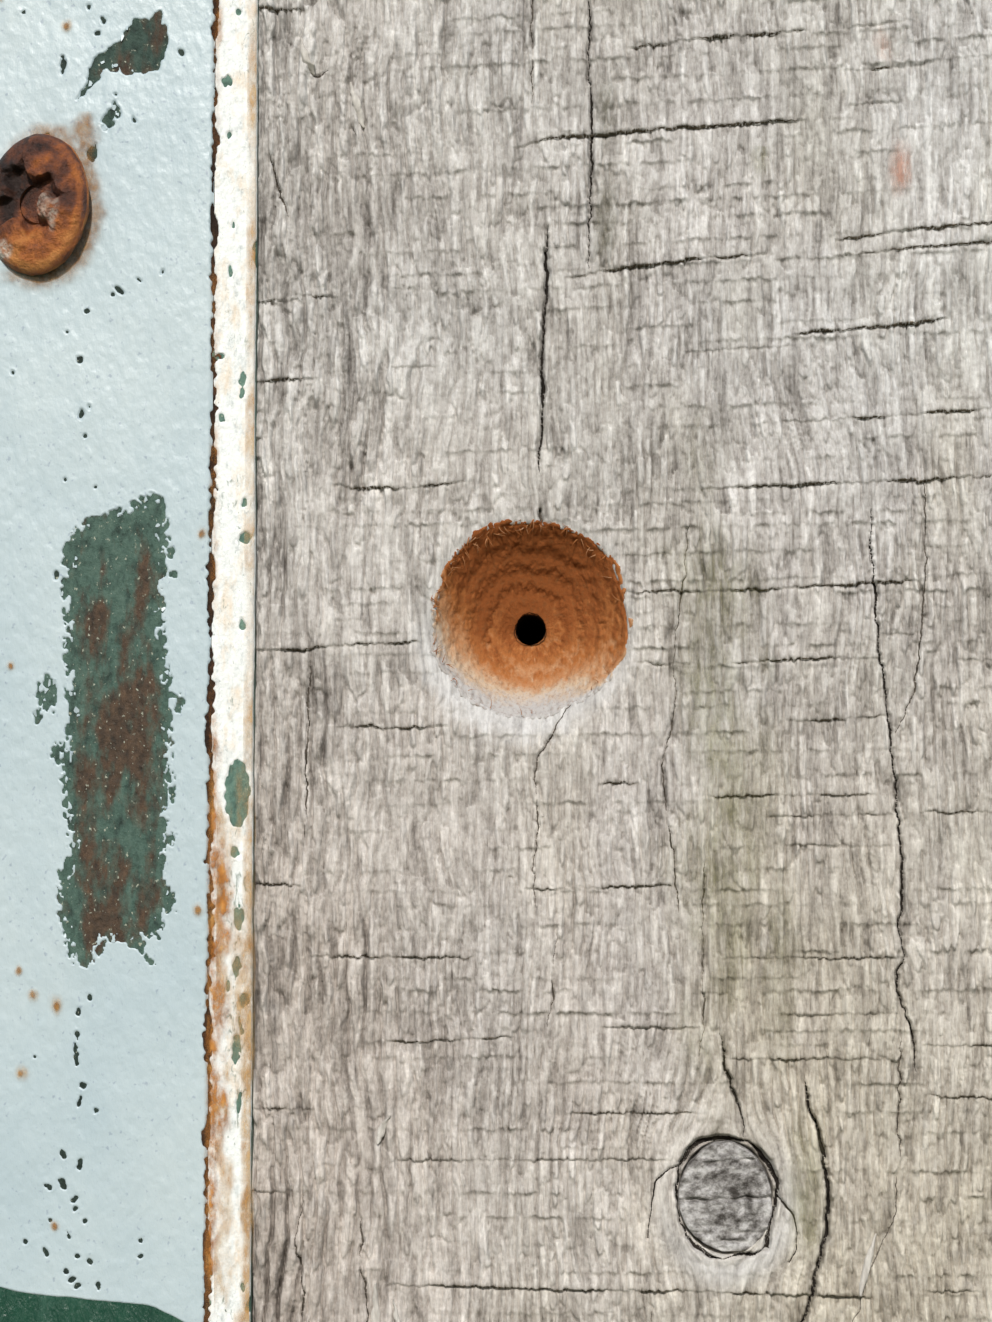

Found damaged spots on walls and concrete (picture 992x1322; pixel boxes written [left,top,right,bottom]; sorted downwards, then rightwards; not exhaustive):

corrosion [33,116,98,284]
peeling [87,144,97,162]
peeling [102,94,136,131]
peeling [78,5,184,99]
crack [538,229,550,472]
peeling [33,493,185,968]
corrosion [196,0,257,1322]
crack [647,525,830,1322]
crack [852,483,928,1322]